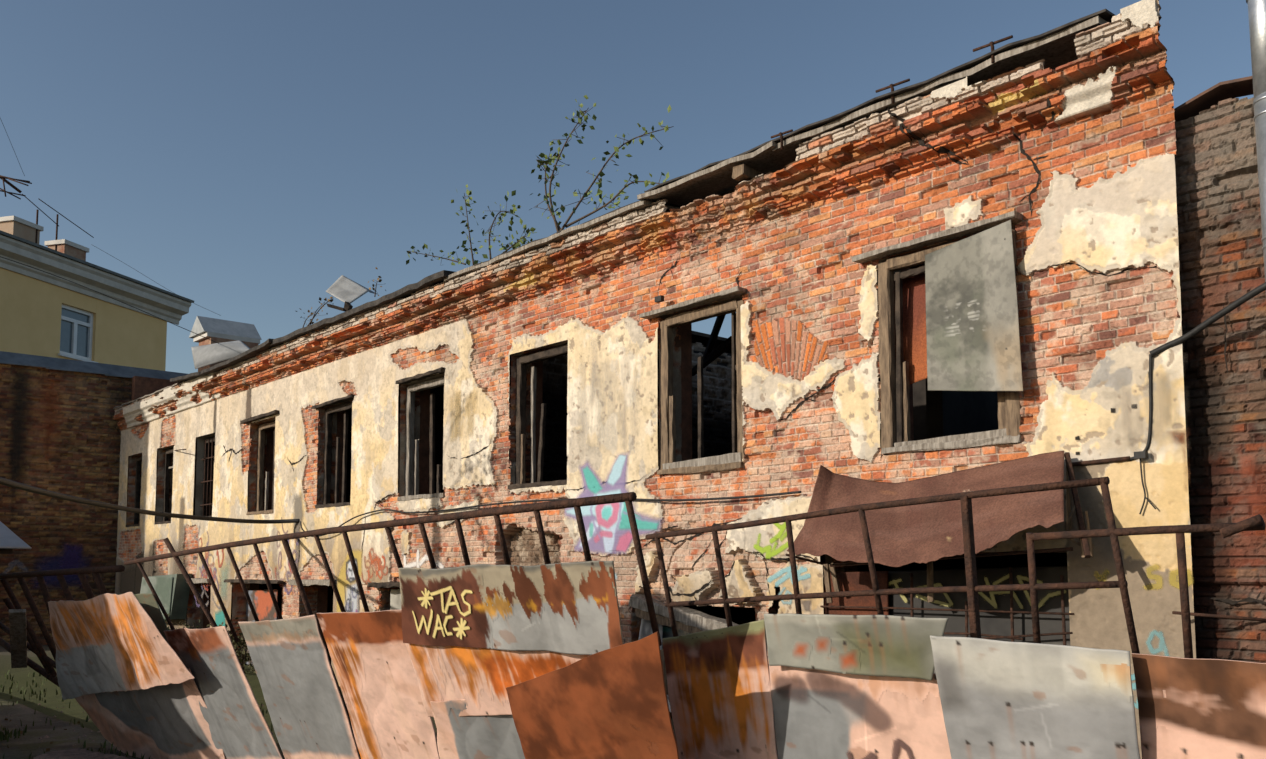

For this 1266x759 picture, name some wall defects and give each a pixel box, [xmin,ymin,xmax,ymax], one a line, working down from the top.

crack [886,107,969,165]
crack [1013,131,1049,214]
spalling [359,87,1178,644]
spalling [240,419,253,475]
spalling [301,402,322,513]
rust [49,594,228,690]
rust [249,561,772,759]